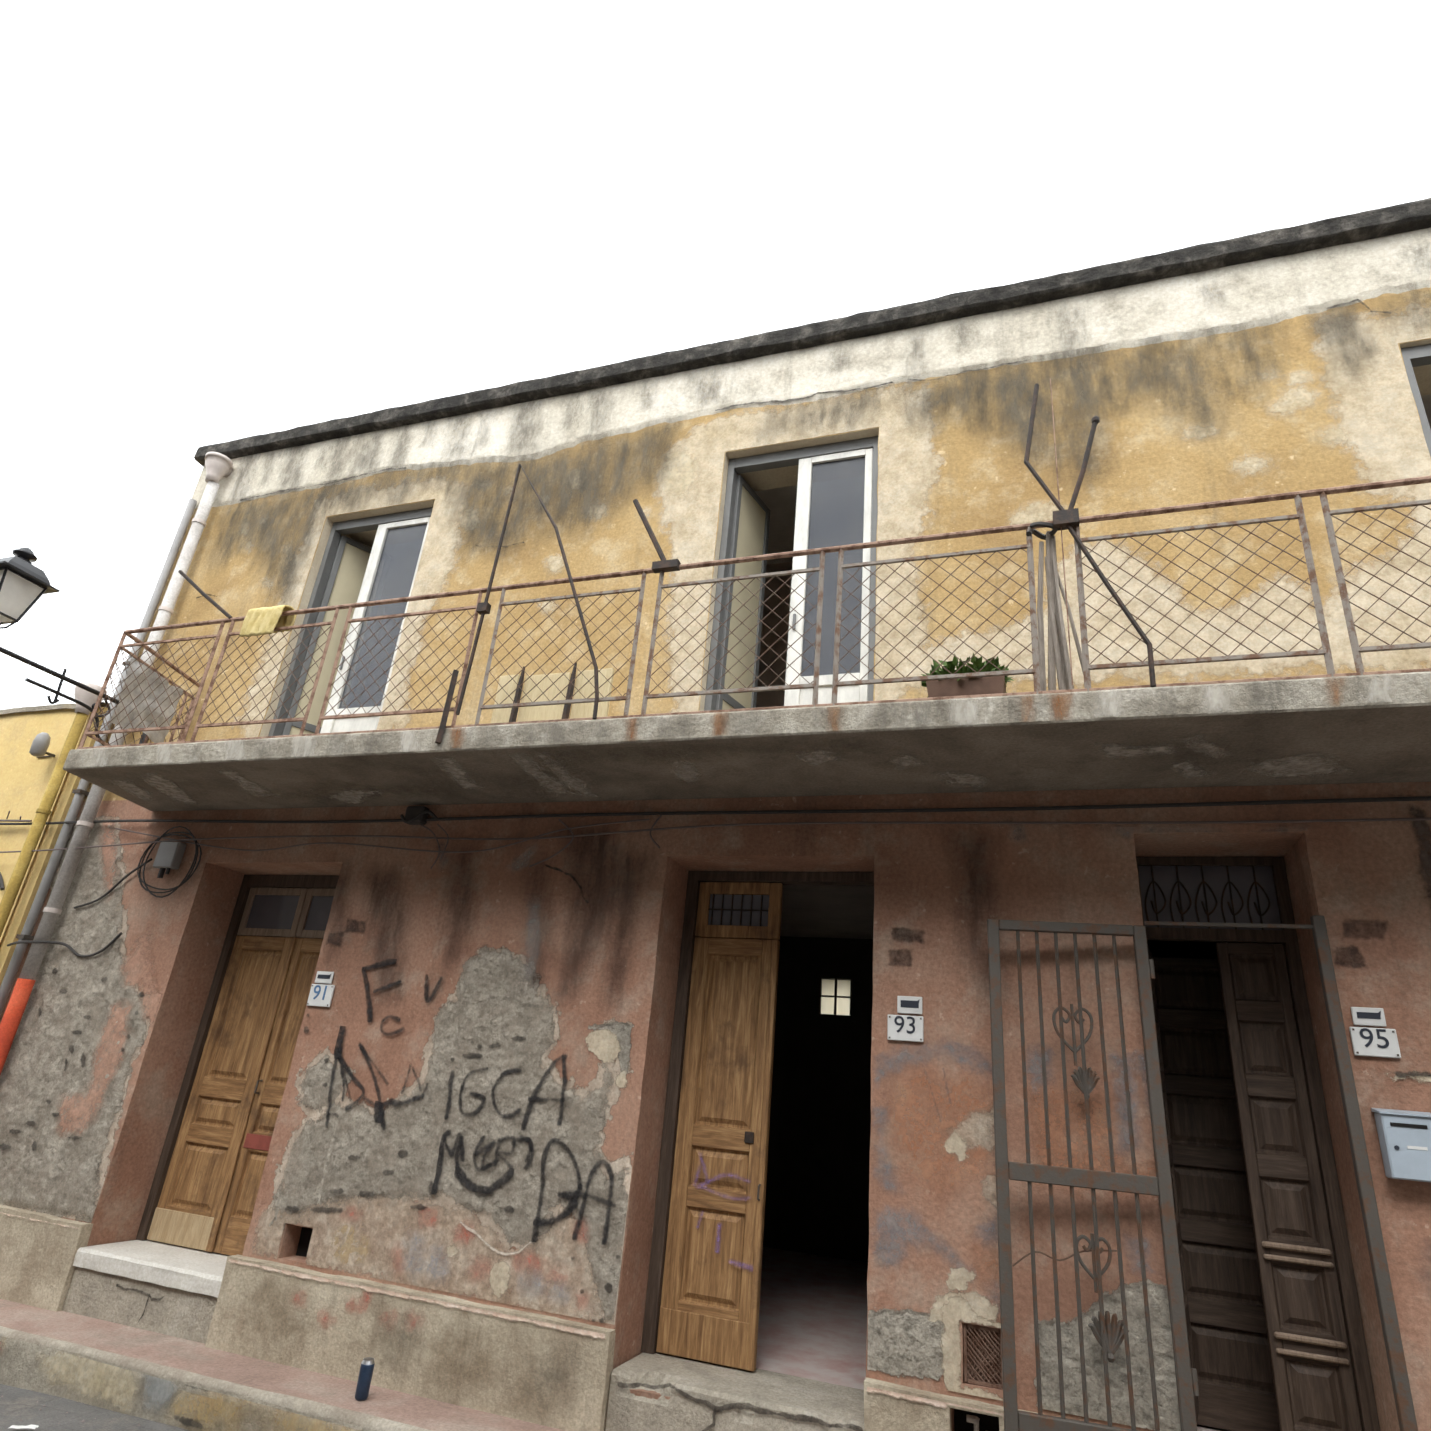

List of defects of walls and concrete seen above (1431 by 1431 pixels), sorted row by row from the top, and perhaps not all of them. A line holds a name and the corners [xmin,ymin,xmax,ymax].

damp [218,436,442,589]
damp [460,404,670,548]
damp [922,365,1052,452]
damp [1070,333,1099,469]
damp [1127,348,1210,420]
damp [1321,313,1368,362]
corrosion [1053,695,1070,718]
flaking render [0,815,162,1223]
flaking render [255,946,634,1325]
peeling [892,1075,997,1207]
flaking render [867,1255,1003,1401]
crack [618,1382,863,1431]